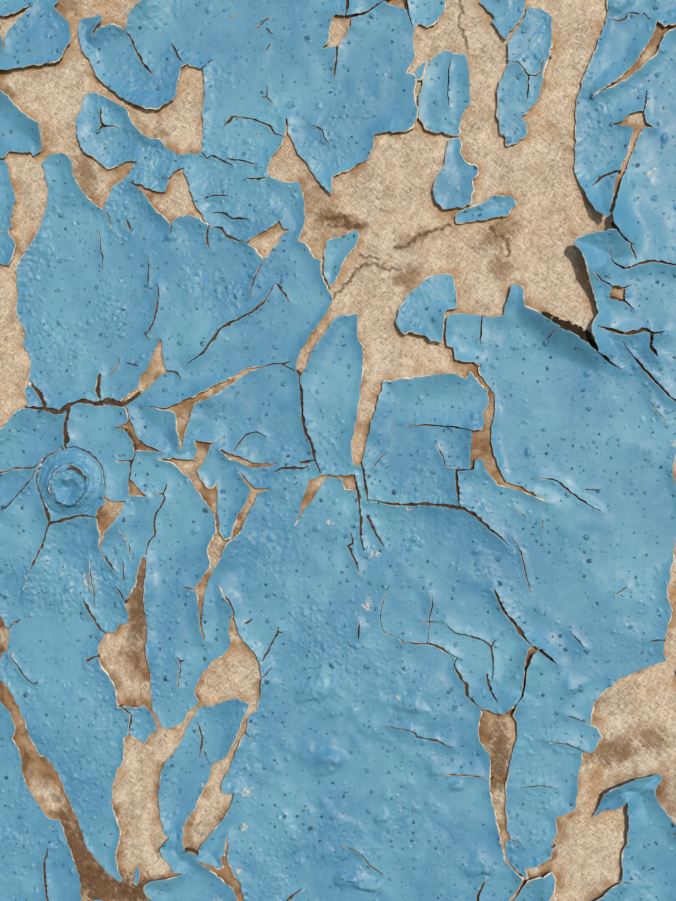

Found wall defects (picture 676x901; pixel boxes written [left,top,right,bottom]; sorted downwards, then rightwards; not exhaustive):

crack [0,360,141,575]
peeling [0,0,210,428]
peeling [97,480,146,558]
peeling [0,557,262,901]
peeling [120,339,277,641]
crack [262,361,321,473]
crack [347,449,531,592]
crack [358,586,526,710]
peeling [268,0,676,519]
crack [494,589,556,663]
peeling [479,538,676,901]
crack [542,222,676,420]